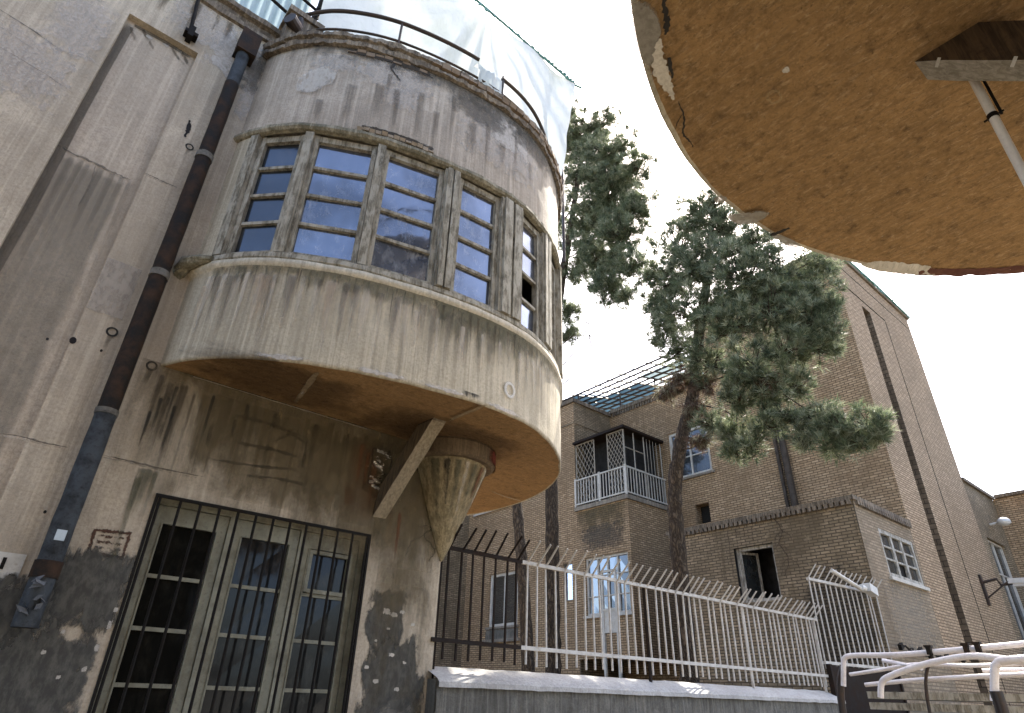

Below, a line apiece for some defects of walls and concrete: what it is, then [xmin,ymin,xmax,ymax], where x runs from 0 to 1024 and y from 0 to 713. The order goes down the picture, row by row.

flaking render [629,1,675,100]
crack [662,0,693,147]
flaking render [729,211,769,224]
flaking render [770,227,805,251]
damp [212,265,556,374]
damp [124,469,157,521]
damp [140,368,485,614]
flaking render [0,547,136,713]
flaking render [354,590,425,713]